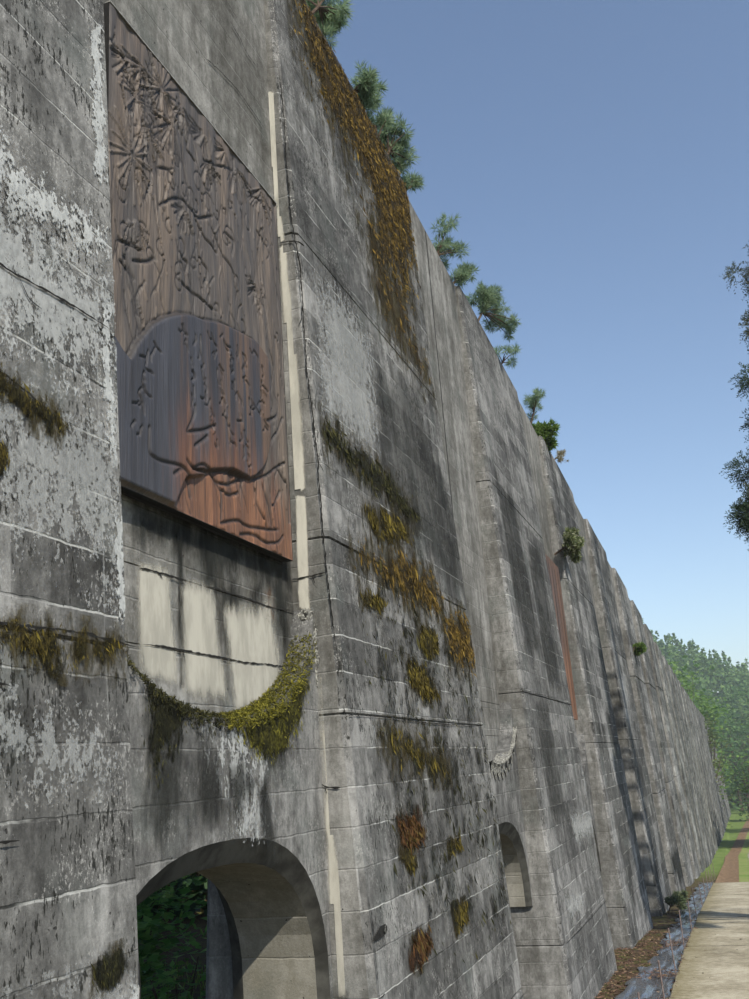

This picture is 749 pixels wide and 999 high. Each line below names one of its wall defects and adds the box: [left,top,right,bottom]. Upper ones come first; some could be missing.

damp [135,91,310,709]
crack [207,0,439,665]
damp [0,606,129,687]
crack [0,621,283,667]
crack [140,568,291,613]
damp [323,732,345,997]